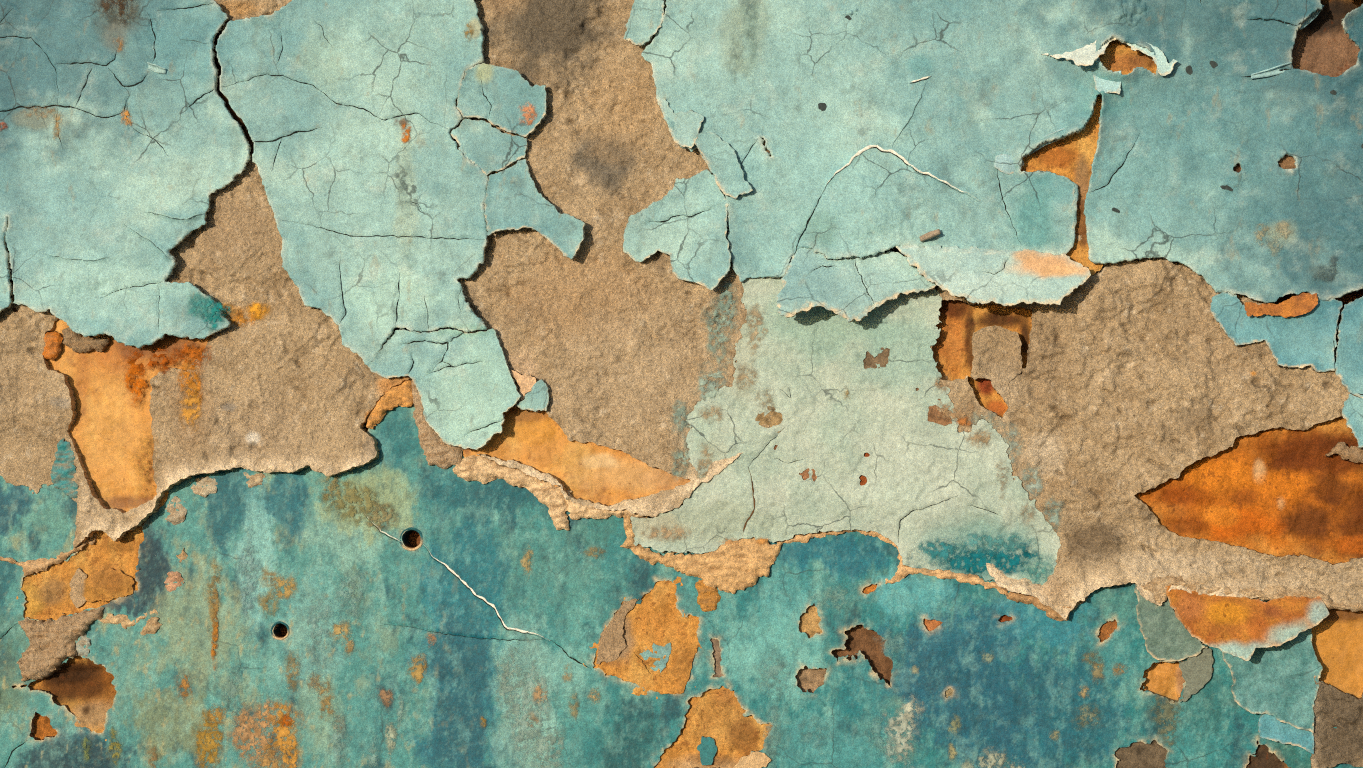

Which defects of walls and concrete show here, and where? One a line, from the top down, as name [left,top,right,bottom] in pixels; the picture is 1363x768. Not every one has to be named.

crack [0,3,441,169]
peeling [1292,0,1363,95]
crack [789,76,1018,263]
crack [101,212,206,334]
crack [296,201,469,324]
spalling [0,0,783,621]
spalling [776,37,1363,768]
spalling [15,656,117,741]
crack [363,512,589,668]
spalling [583,576,773,768]